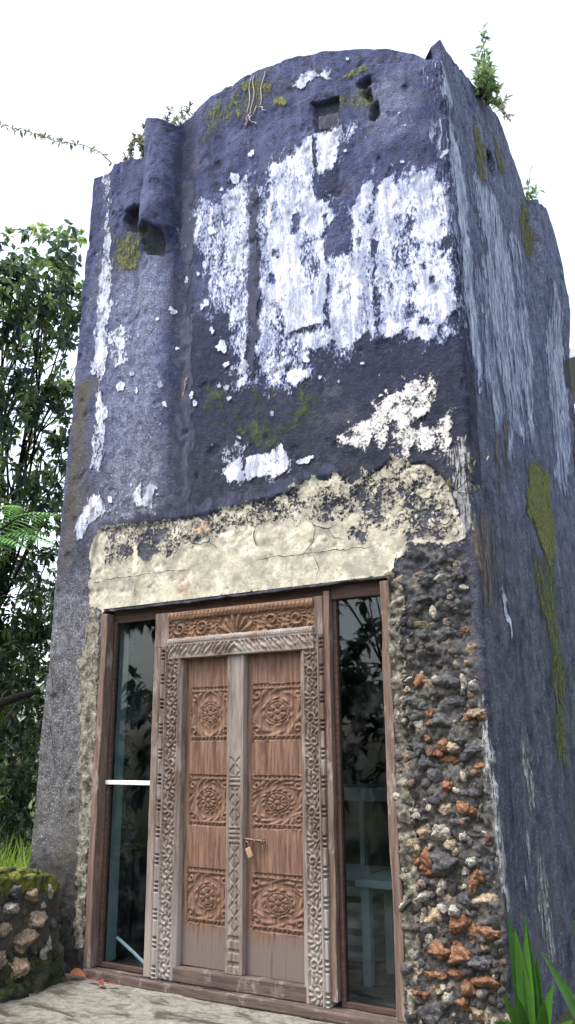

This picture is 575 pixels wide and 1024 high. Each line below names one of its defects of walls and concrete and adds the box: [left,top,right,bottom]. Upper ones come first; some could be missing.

peeling [89,173,139,473]
damp [103,173,339,528]
peeling [140,51,490,416]
crack [95,570,185,591]
spalling [73,373,466,1024]
crack [244,510,369,573]